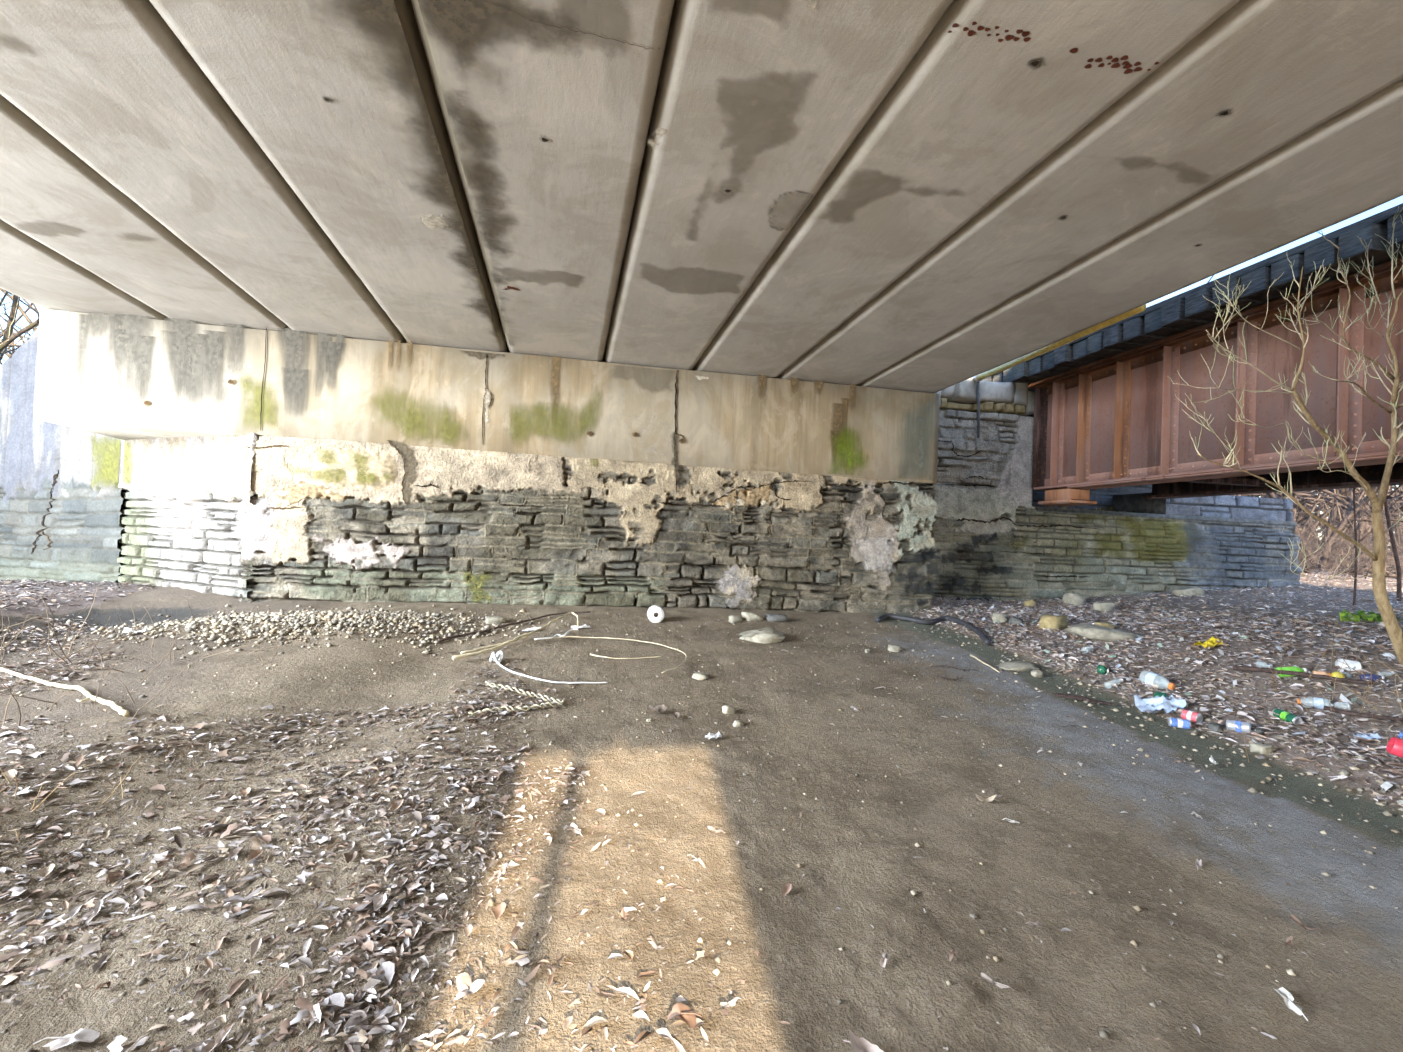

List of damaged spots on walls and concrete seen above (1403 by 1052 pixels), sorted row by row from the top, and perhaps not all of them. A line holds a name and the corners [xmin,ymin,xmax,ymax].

leakage [418,0,575,59]
rust [948,22,1031,42]
rust [1069,48,1159,74]
leakage [349,0,507,282]
leakage [473,300,497,332]
leakage [78,312,243,399]
leakage [279,327,345,411]
crack [660,372,810,507]
spalling [387,440,416,503]
spalling [712,481,771,508]